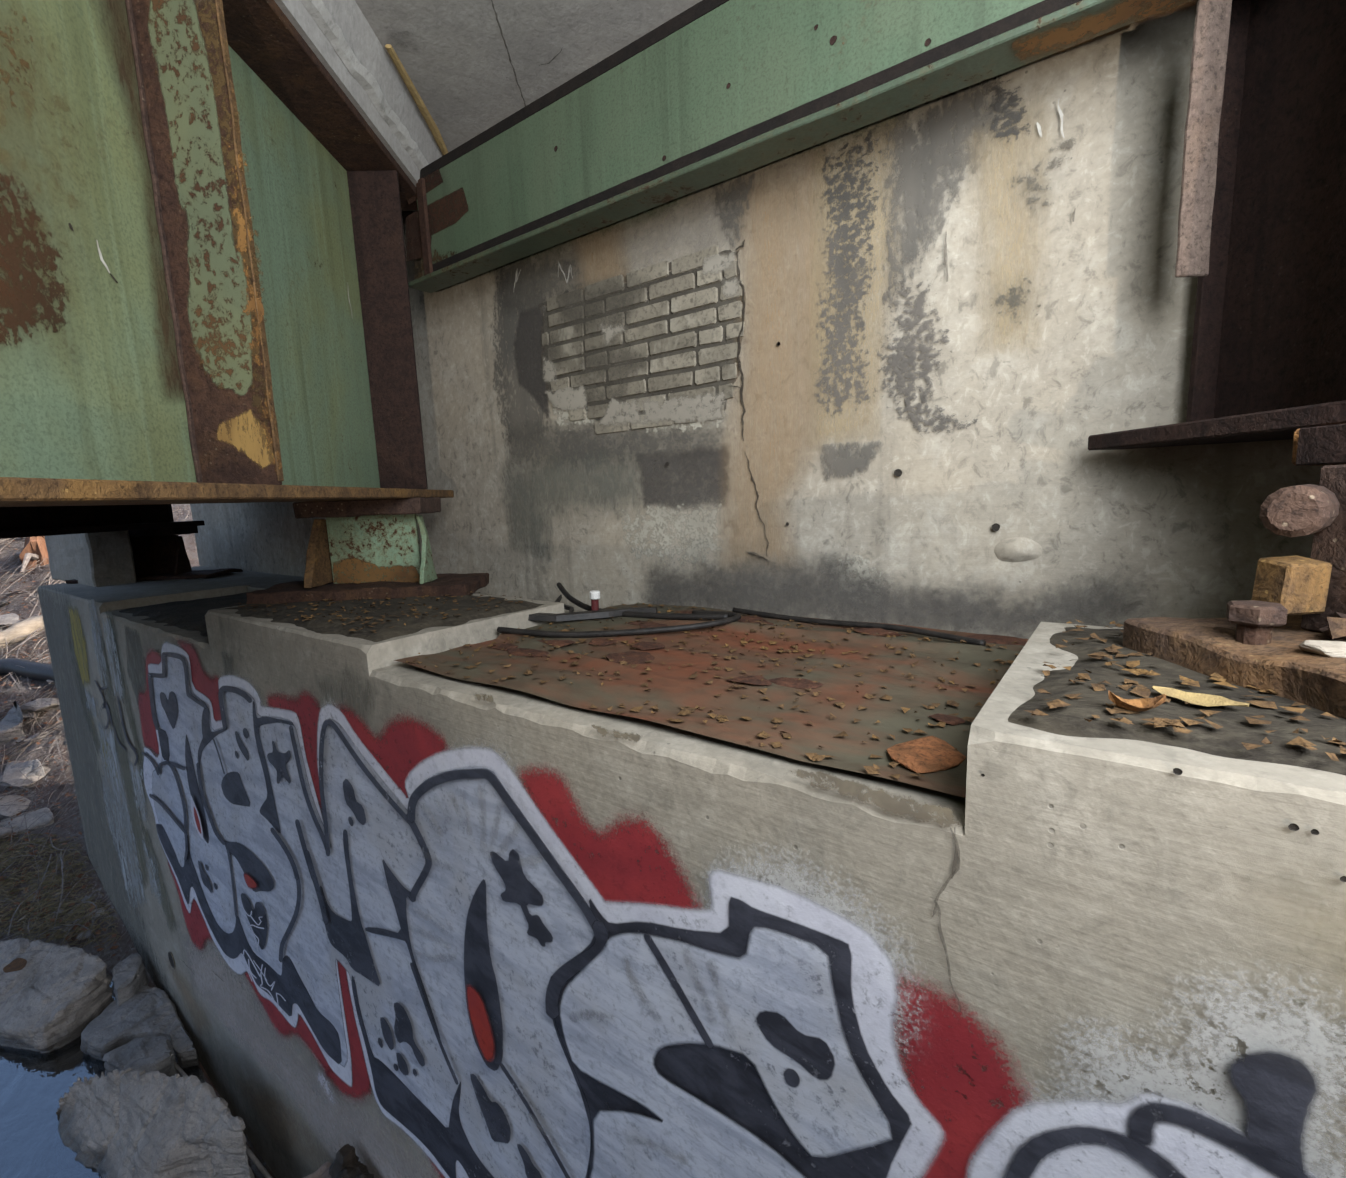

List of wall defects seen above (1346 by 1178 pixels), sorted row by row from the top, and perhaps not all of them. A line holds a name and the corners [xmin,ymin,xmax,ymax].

rust [103,0,145,156]
crack [491,0,563,106]
rust [0,173,67,345]
rust [148,0,284,481]
spalling [538,245,746,435]
crack [732,240,770,562]
water stain [491,253,1129,635]
water stain [814,76,1031,433]
crack [942,232,950,282]
rust [230,558,523,633]
crack [932,827,962,1012]